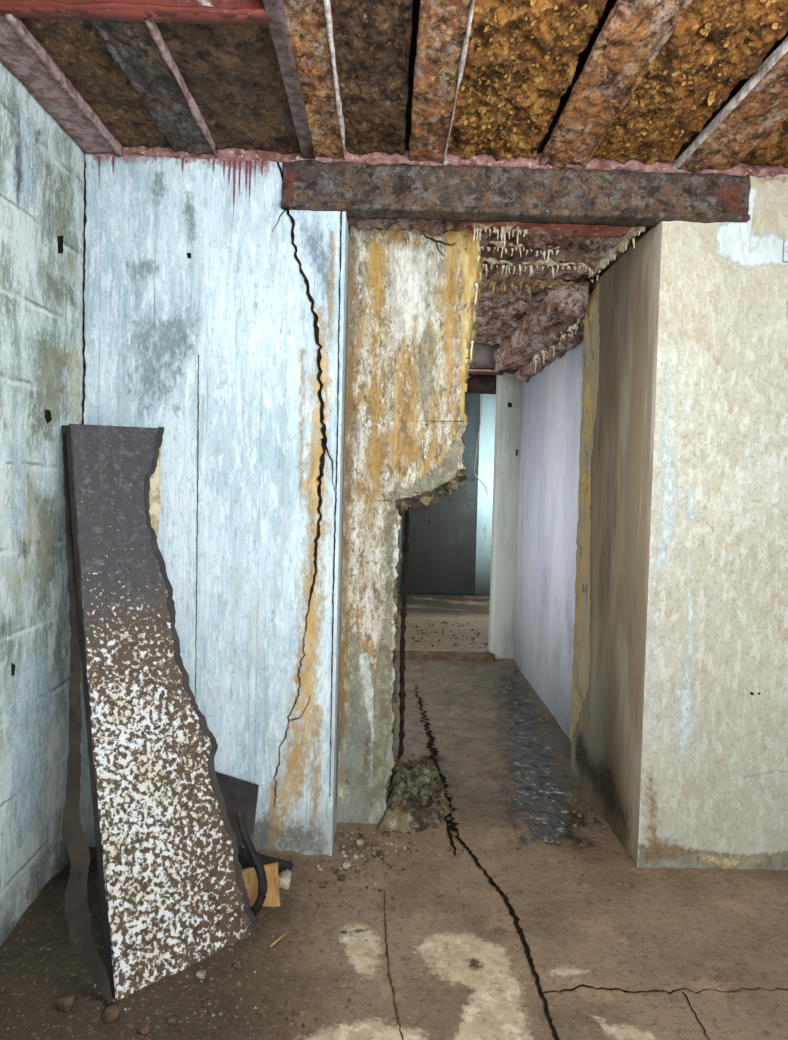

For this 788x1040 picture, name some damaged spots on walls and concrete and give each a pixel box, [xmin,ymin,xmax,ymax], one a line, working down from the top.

corrosion [269,232,335,851]
crack [272,208,342,807]
corrosion [335,238,385,804]
corrosion [365,316,417,511]
damp [386,243,434,349]
spalling [363,441,468,806]
corrosion [442,245,461,411]
damp [445,223,788,870]
crack [383,891,403,1040]
crack [412,682,788,1040]